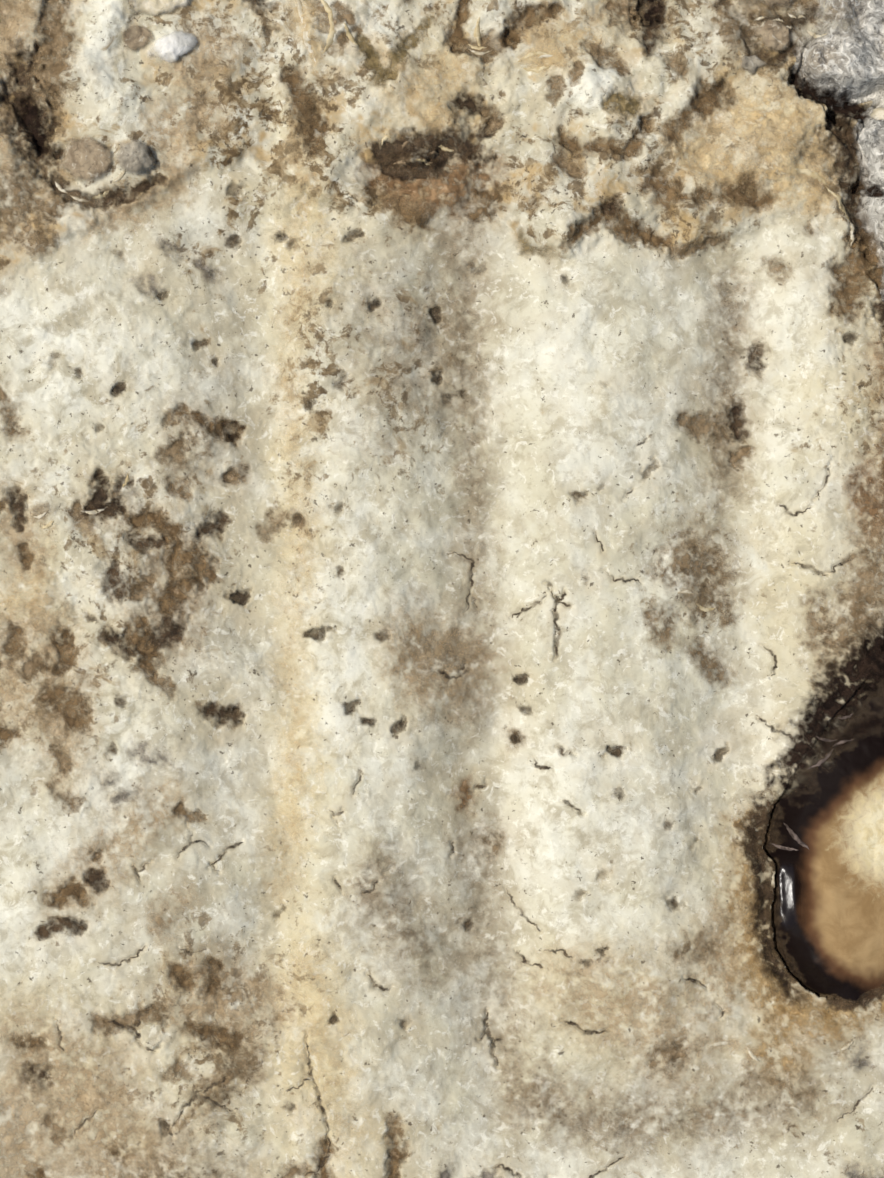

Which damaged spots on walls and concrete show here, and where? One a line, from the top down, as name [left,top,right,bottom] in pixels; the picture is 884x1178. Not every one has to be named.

crack [512,584,570,655]
spalling [808,713,884,769]
spalling [771,823,809,851]
crack [287,1043,331,1174]